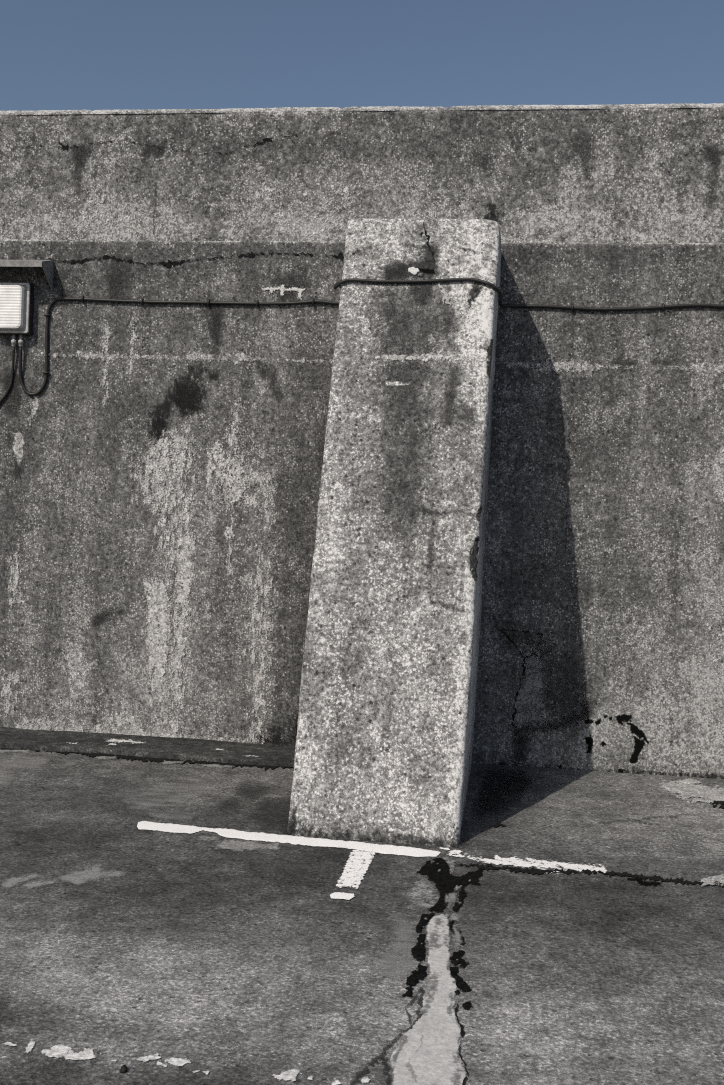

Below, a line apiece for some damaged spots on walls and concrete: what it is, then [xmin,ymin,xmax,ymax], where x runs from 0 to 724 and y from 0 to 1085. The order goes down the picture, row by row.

crack [45,250,345,268]
damp [0,304,333,744]
crack [500,629,543,726]
crack [699,800,724,808]
crack [456,863,724,887]
crack [350,986,424,1085]
crack [454,1003,469,1085]